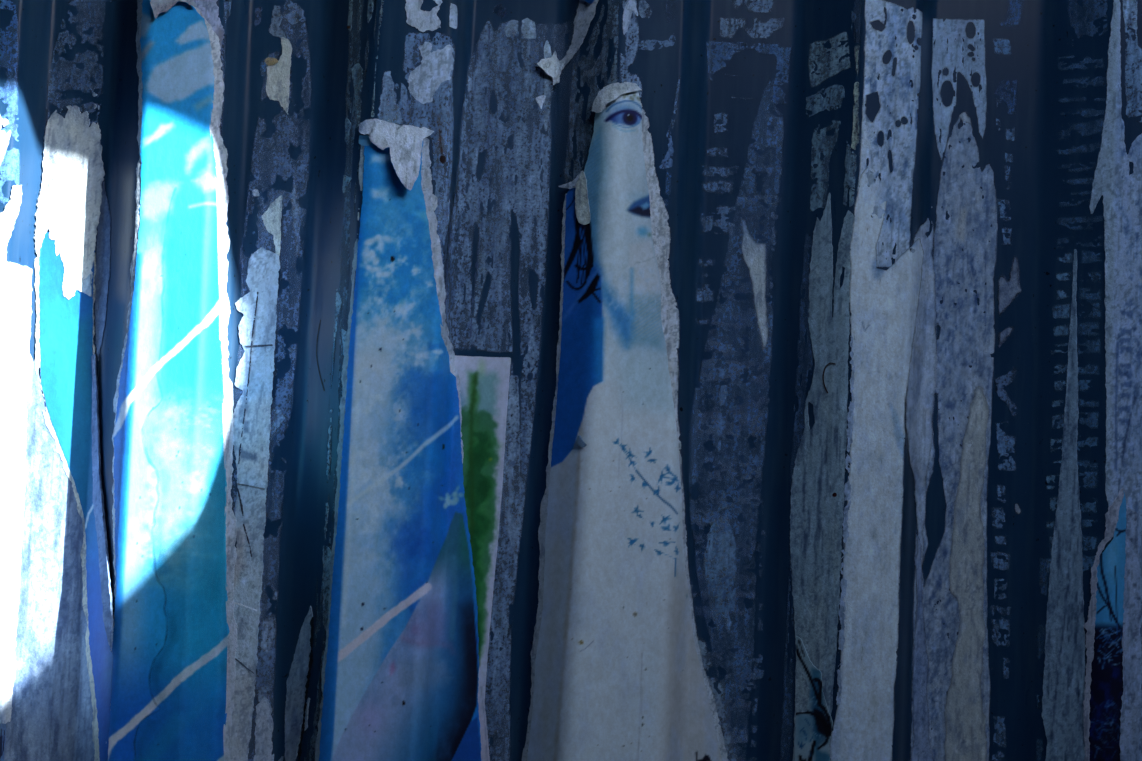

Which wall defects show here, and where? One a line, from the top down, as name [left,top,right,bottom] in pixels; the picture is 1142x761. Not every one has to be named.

peeling [378,42,454,245]